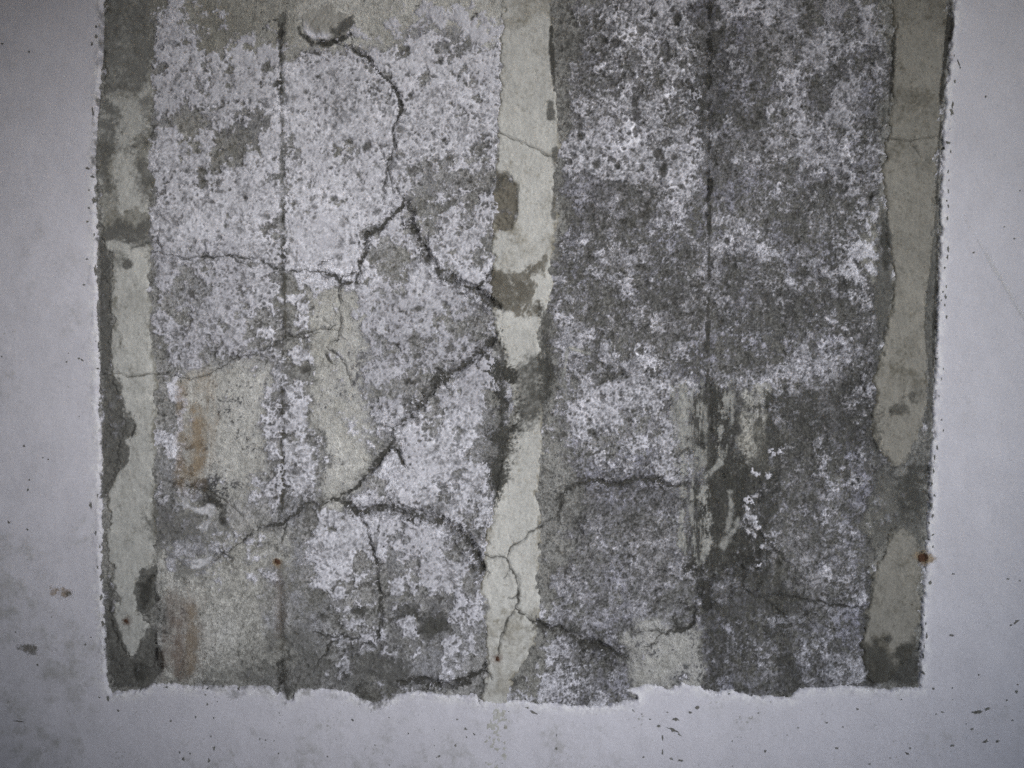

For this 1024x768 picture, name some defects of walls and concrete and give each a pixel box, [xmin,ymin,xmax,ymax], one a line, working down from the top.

peeling [559,0,705,192]
peeling [716,0,880,206]
flaking render [86,154,136,508]
flaking render [97,565,168,689]
peeling [151,1,518,532]
peeling [310,507,481,658]
crack [128,33,862,693]
peeling [565,374,694,482]
peeling [743,493,781,549]
flaking render [874,215,894,341]
corrosion [916,550,934,564]
flaking render [925,189,949,432]